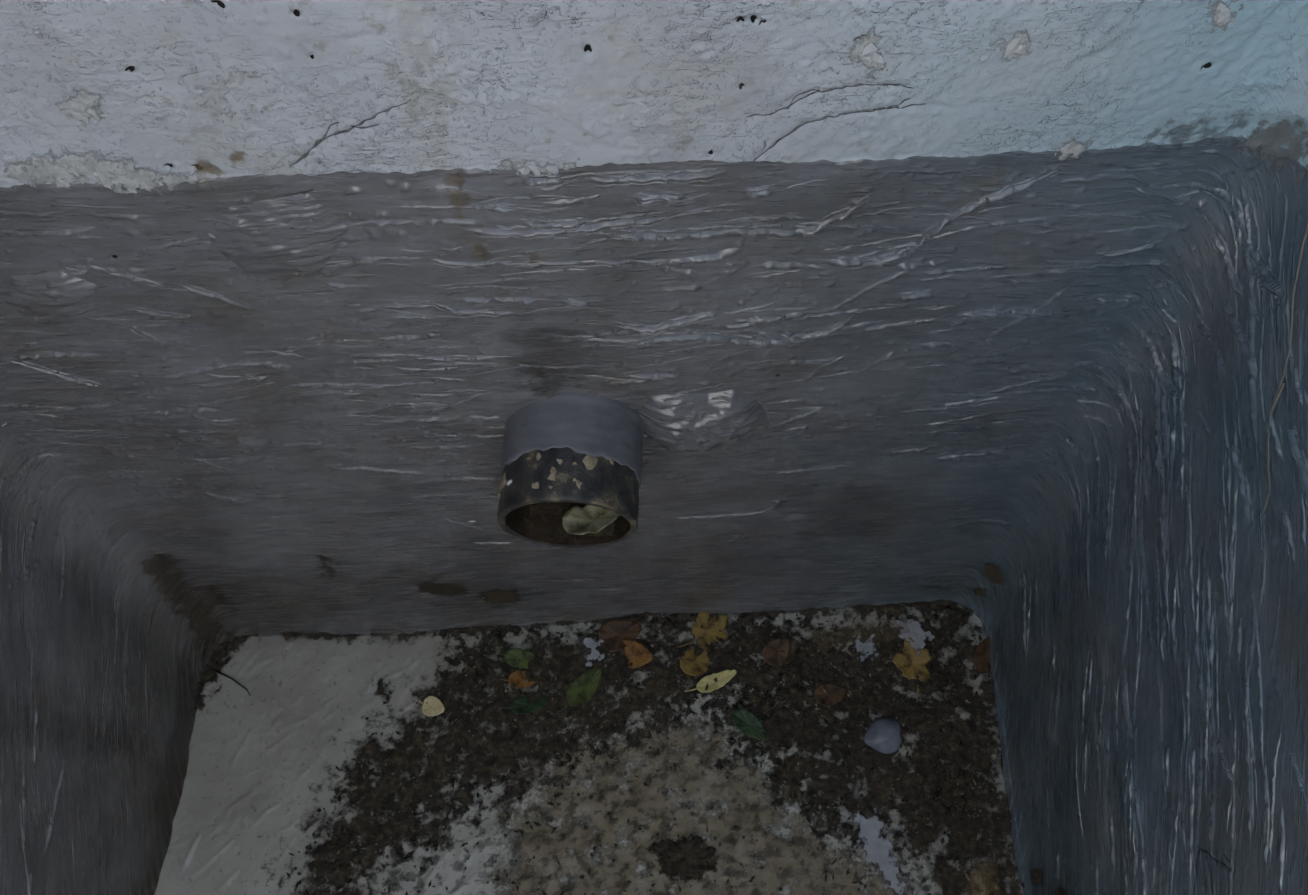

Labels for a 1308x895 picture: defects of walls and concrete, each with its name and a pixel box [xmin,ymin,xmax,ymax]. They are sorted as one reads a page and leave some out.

crack [747,83,923,161]